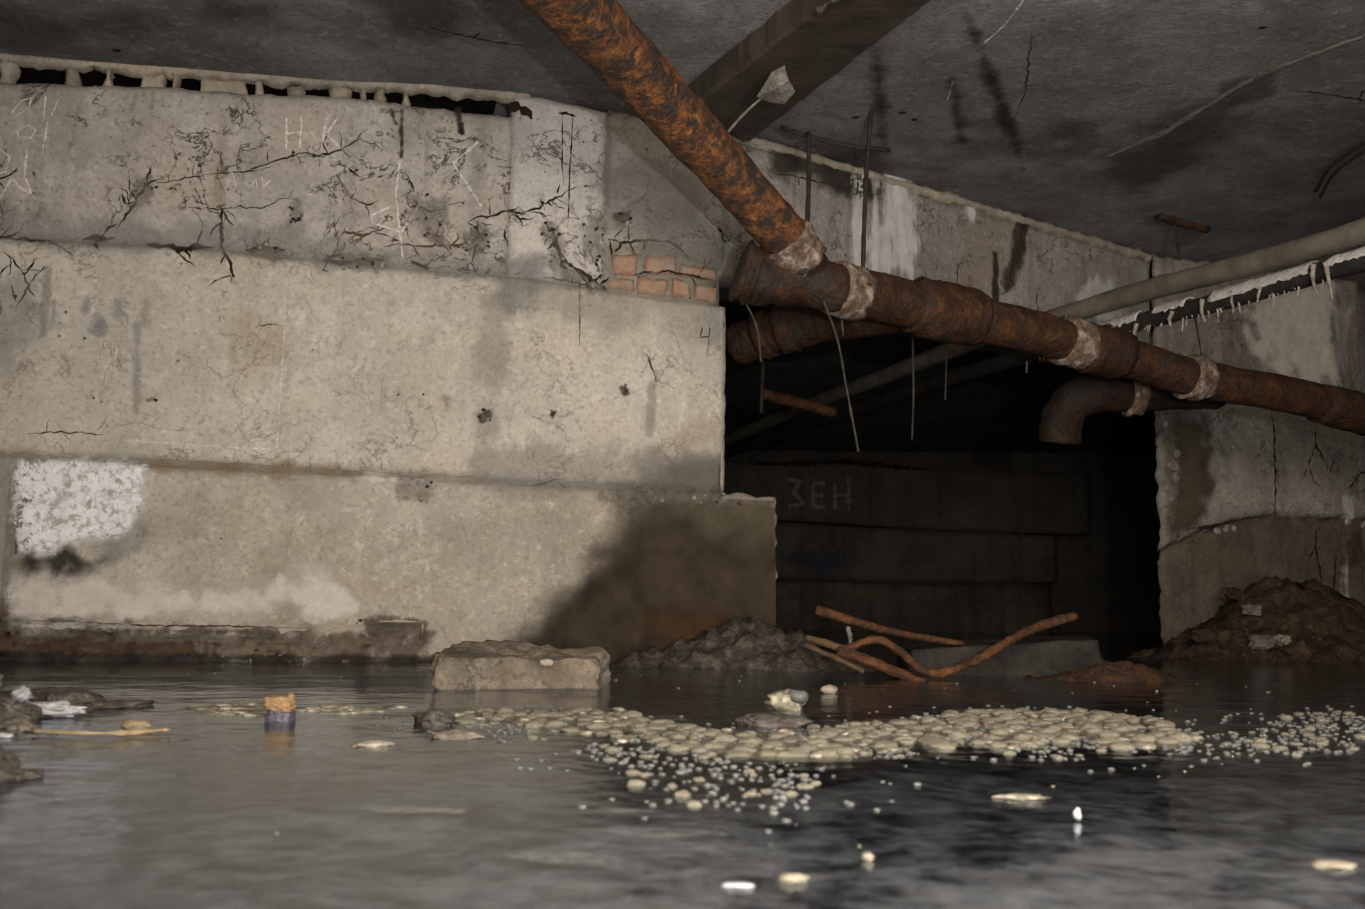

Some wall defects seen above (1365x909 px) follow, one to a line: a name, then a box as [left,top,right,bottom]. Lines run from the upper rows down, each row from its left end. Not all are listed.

water stain [983,64,1018,146]
crack [0,130,742,346]
water stain [0,547,434,662]
water stain [534,460,776,663]